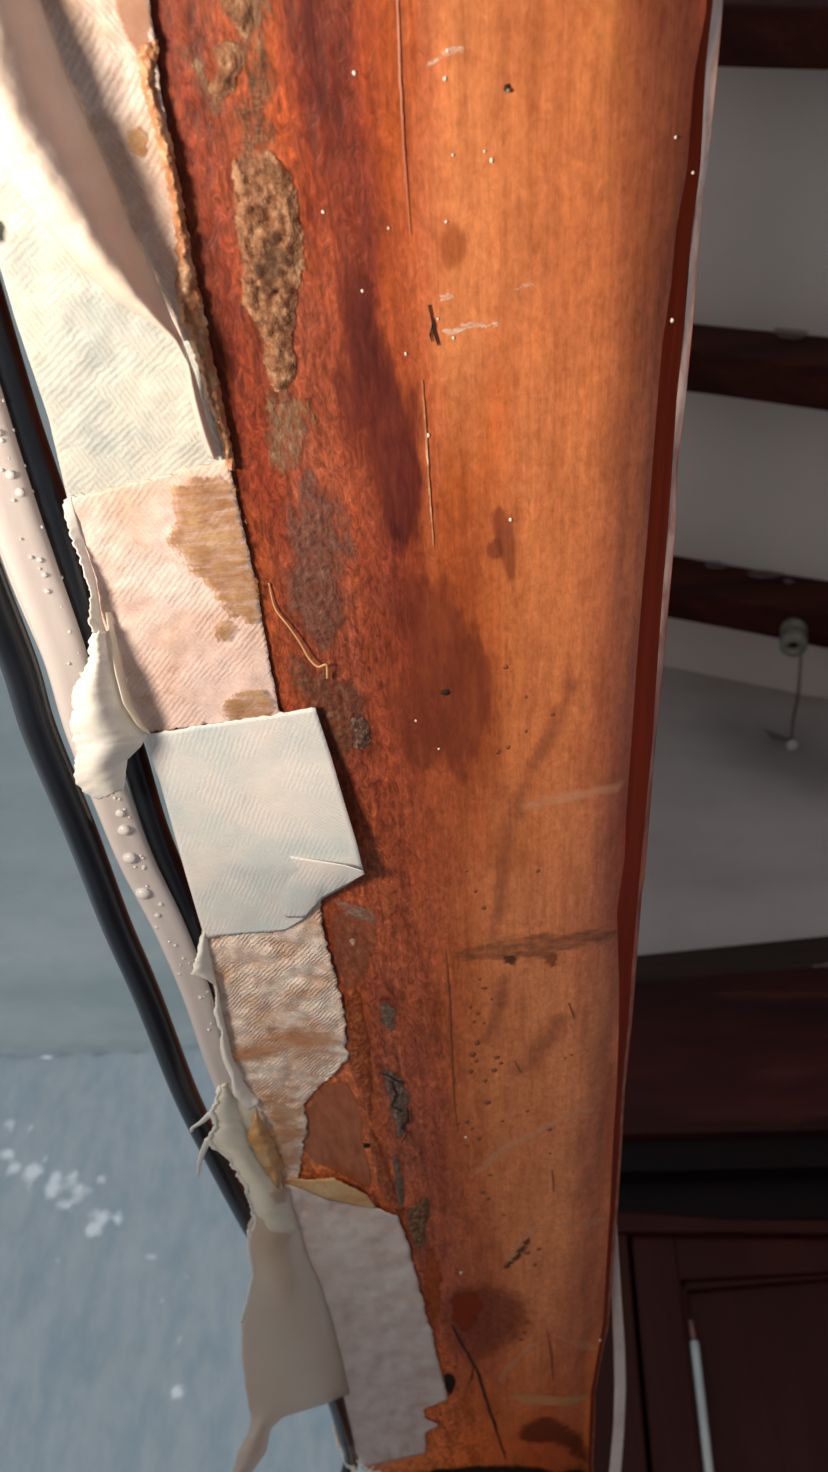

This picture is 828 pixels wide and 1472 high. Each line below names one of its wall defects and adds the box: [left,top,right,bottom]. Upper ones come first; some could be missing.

peeling [0,0,219,460]
spalling [380,1003,396,1032]
water stain [467,978,503,1082]
peeling [302,1082,371,1186]
spalling [380,1070,430,1247]
water stain [421,1249,530,1356]